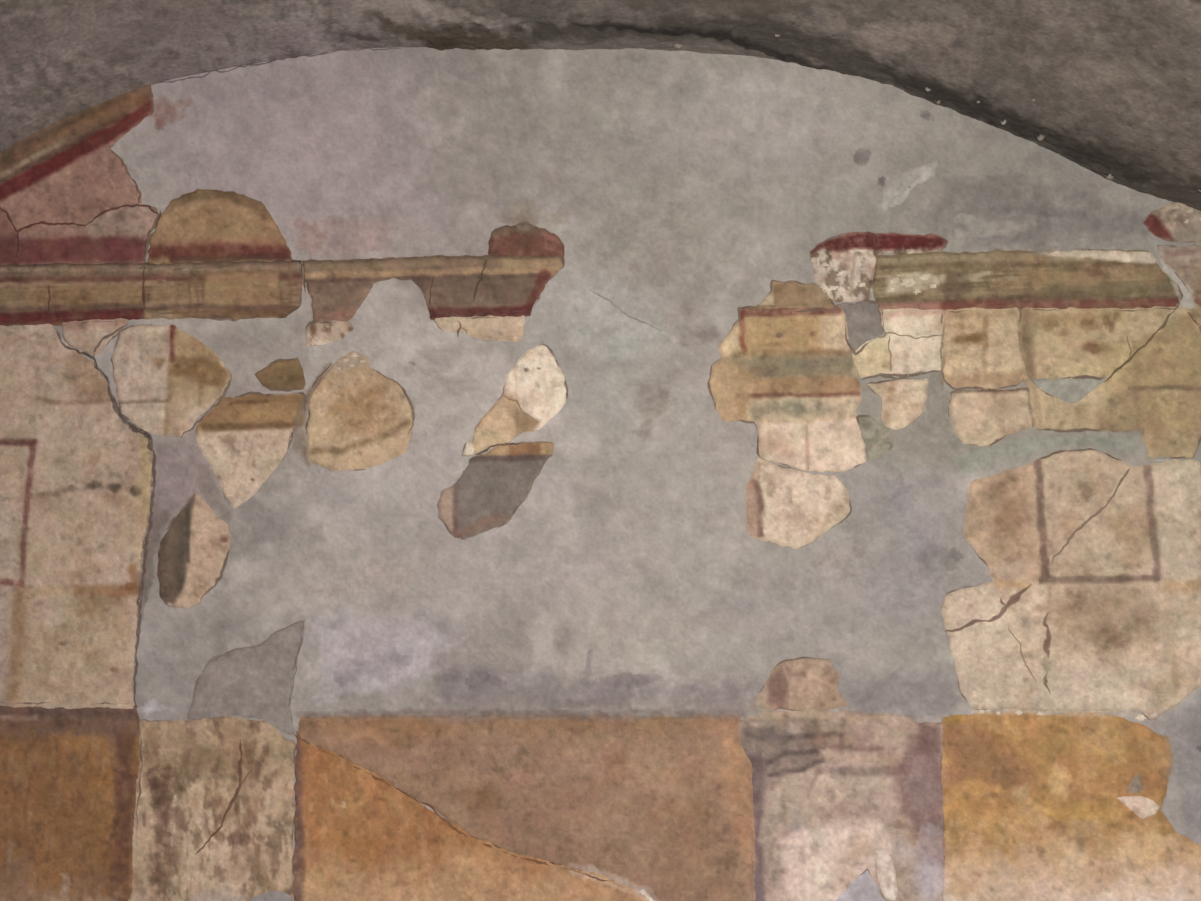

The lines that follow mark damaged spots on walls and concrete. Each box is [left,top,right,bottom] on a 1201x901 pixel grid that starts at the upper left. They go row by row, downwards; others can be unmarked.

spalling [514,8,1201,227]
peeling [811,251,947,302]
peeling [1047,250,1155,263]
peeling [306,317,354,347]
crack [1105,310,1201,382]
crack [0,147,231,706]
crack [945,468,1131,694]
spalling [971,707,1158,721]
crack [211,621,613,882]
crack [195,740,252,855]
flaking render [1117,796,1159,819]